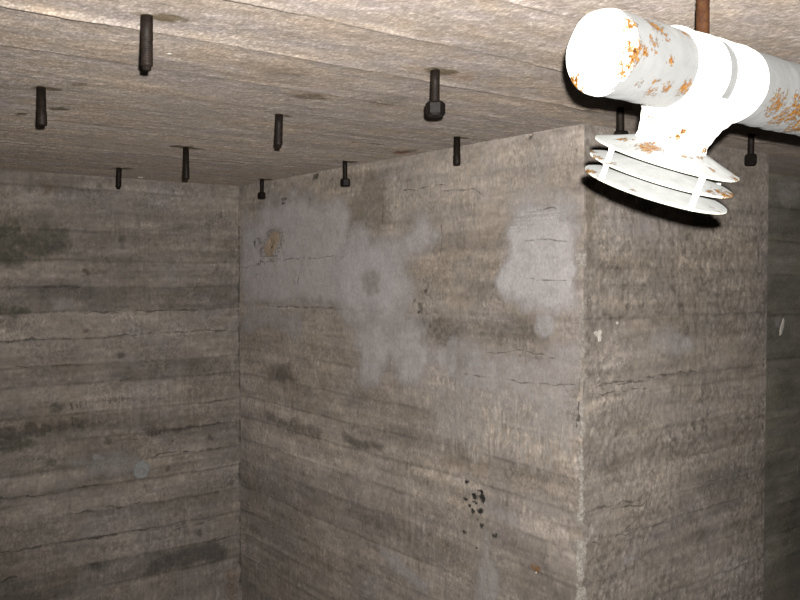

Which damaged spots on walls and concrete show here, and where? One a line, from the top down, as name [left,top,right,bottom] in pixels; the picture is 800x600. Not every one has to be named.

water stain [241,155,580,474]